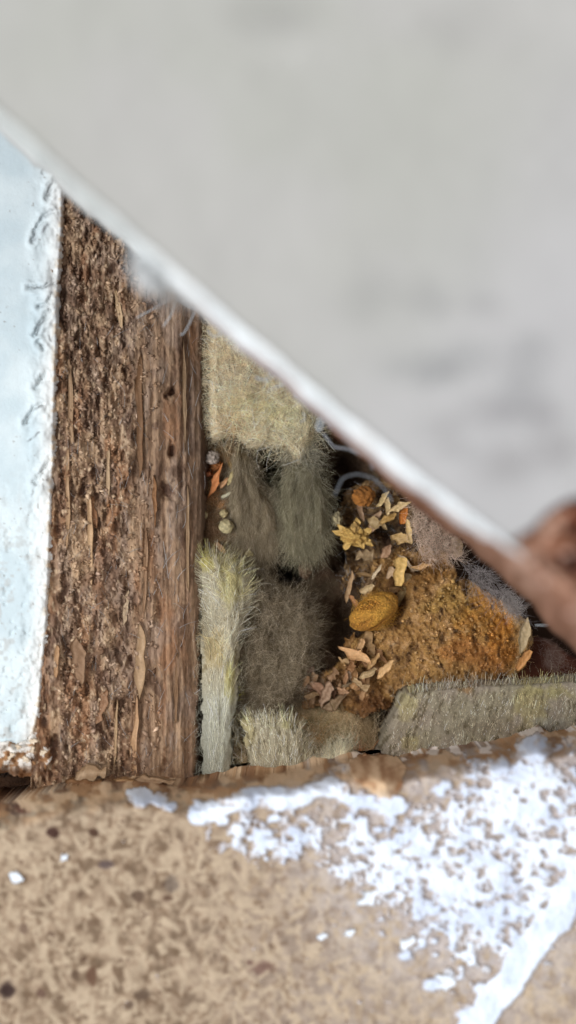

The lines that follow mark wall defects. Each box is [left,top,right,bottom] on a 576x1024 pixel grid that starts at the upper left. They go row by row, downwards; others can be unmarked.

spalling [507,499,576,617]